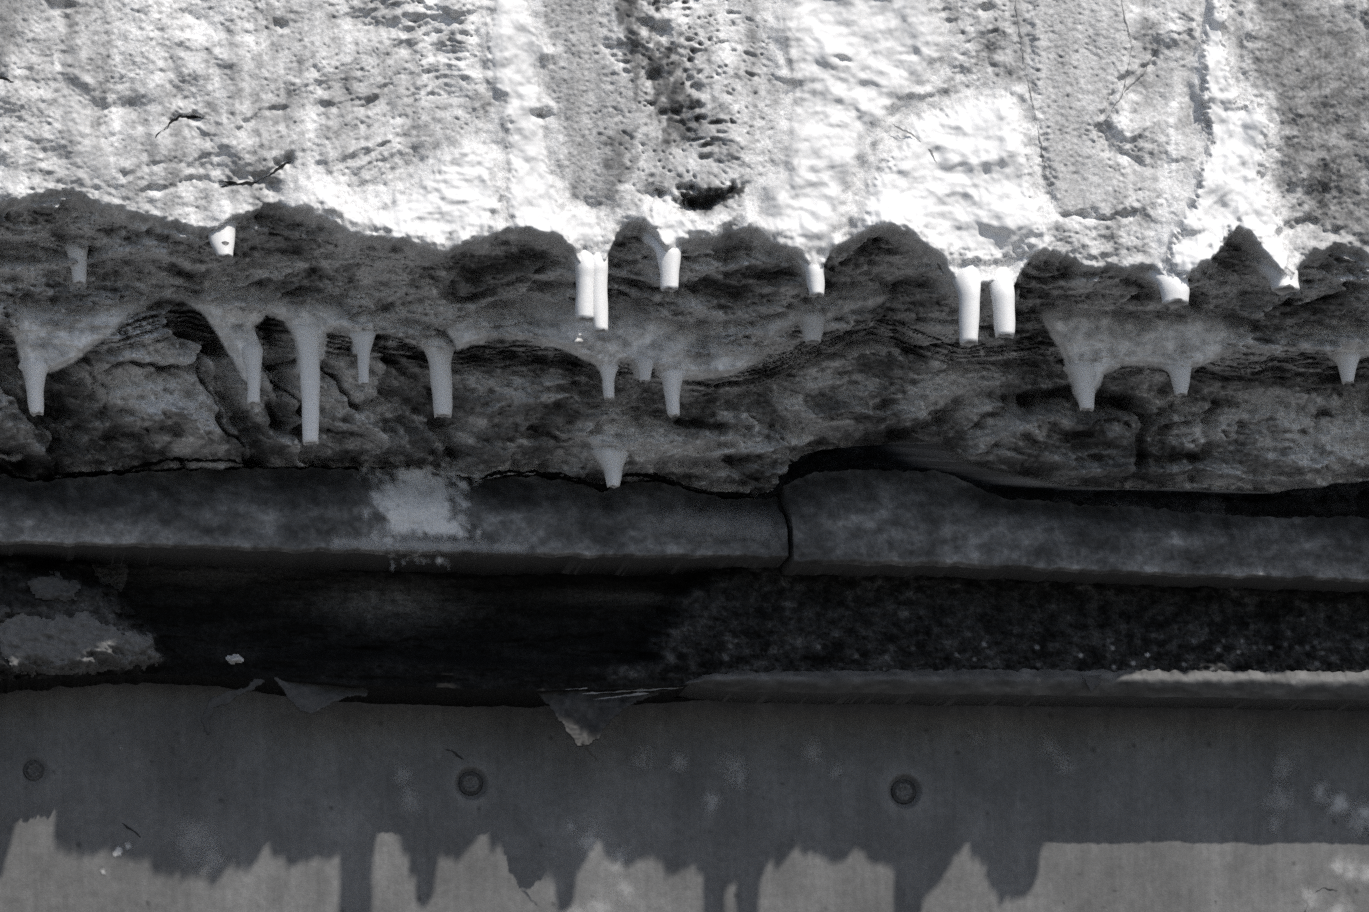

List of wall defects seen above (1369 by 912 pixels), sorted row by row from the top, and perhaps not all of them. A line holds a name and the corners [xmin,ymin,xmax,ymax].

crack [156,115,211,136]
crack [218,161,291,187]
water stain [615,0,701,147]
water stain [644,191,727,252]
crack [1015,1,1052,200]
water stain [1166,0,1369,278]
crack [30,457,252,479]
peeling [0,562,161,677]